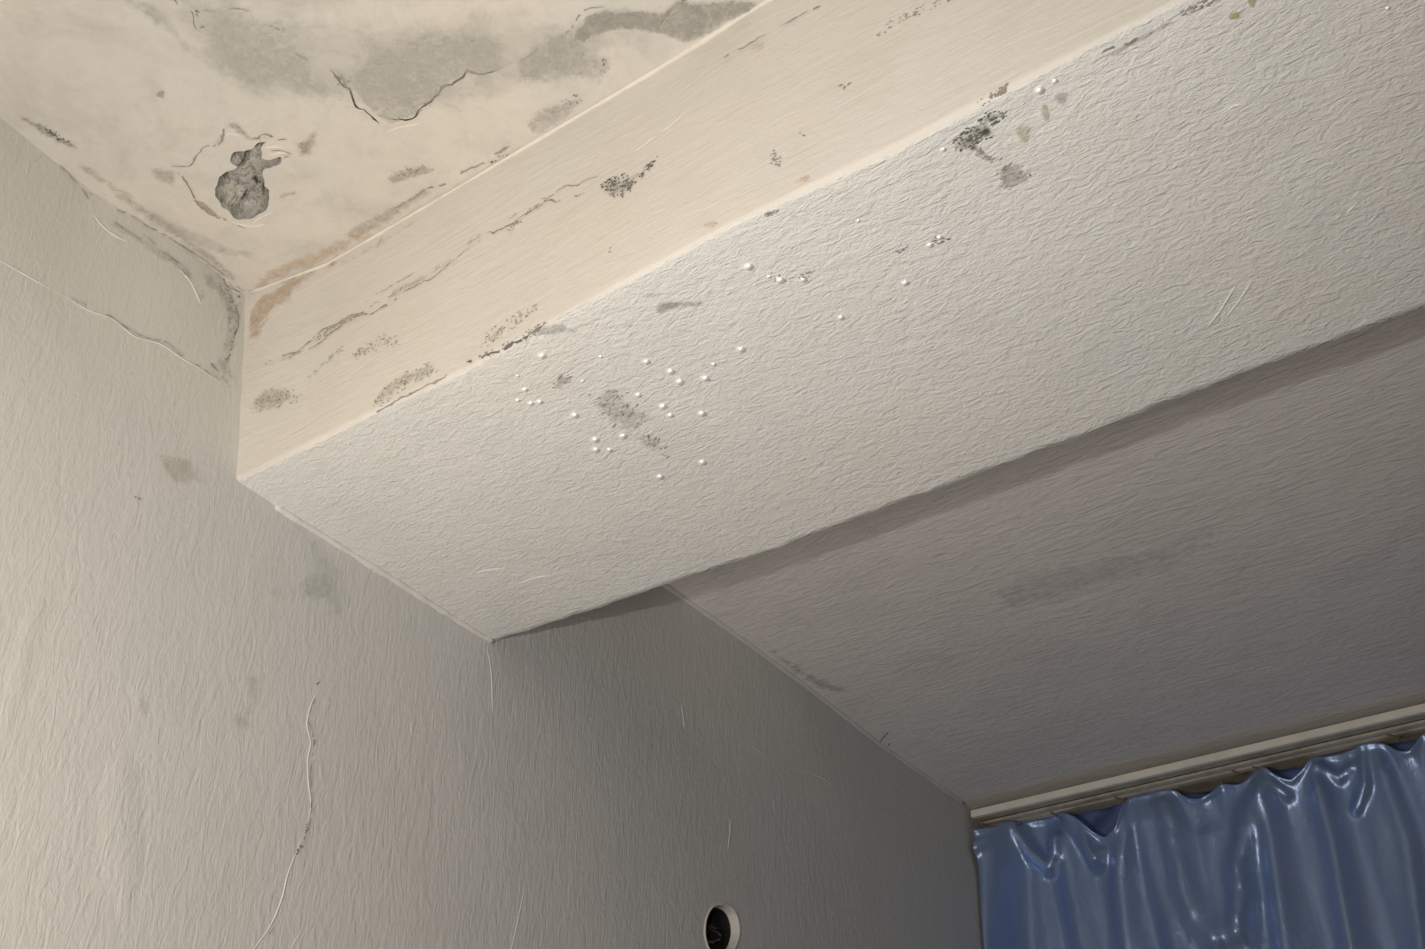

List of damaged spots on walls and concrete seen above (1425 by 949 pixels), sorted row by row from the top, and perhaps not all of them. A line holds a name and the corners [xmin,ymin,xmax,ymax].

leakage [560,0,753,41]
spalling [171,129,291,229]
crack [294,52,532,133]
leakage [489,156,658,234]
leakage [952,83,1031,190]
leakage [282,248,469,378]
leakage [589,390,669,459]
crack [254,682,320,949]